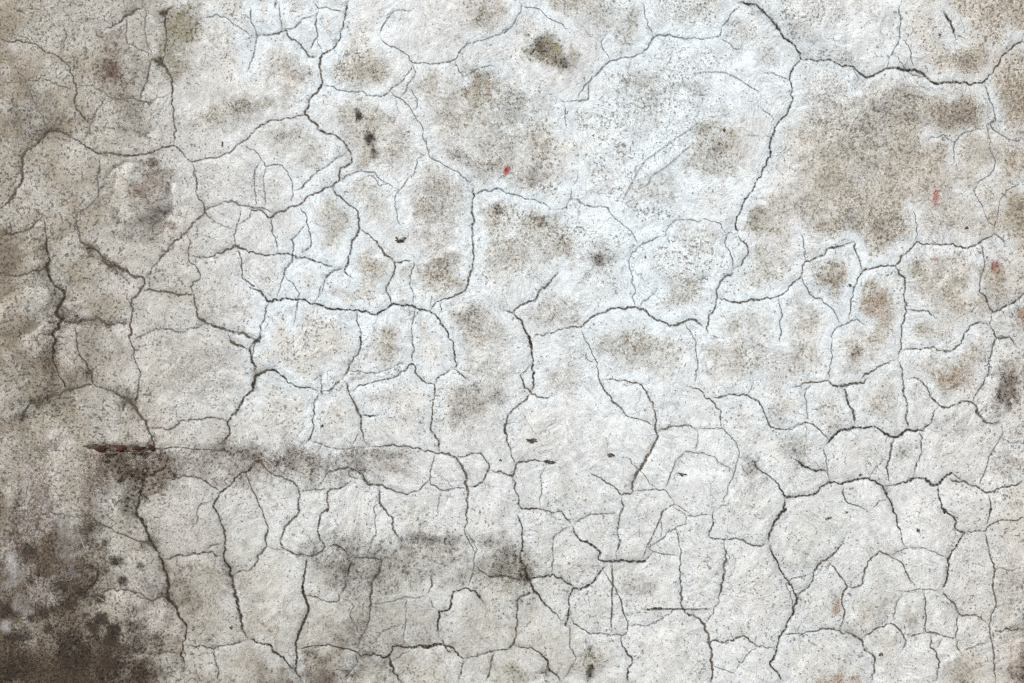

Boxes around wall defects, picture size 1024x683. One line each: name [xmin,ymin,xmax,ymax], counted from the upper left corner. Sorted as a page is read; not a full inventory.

crack [484,6,564,40]
crack [564,2,700,125]
crack [665,1,1023,268]
crack [2,4,526,448]
crack [141,191,1022,681]
damp [4,533,35,560]
damp [0,580,158,683]
damp [110,556,129,586]
crack [38,489,217,662]